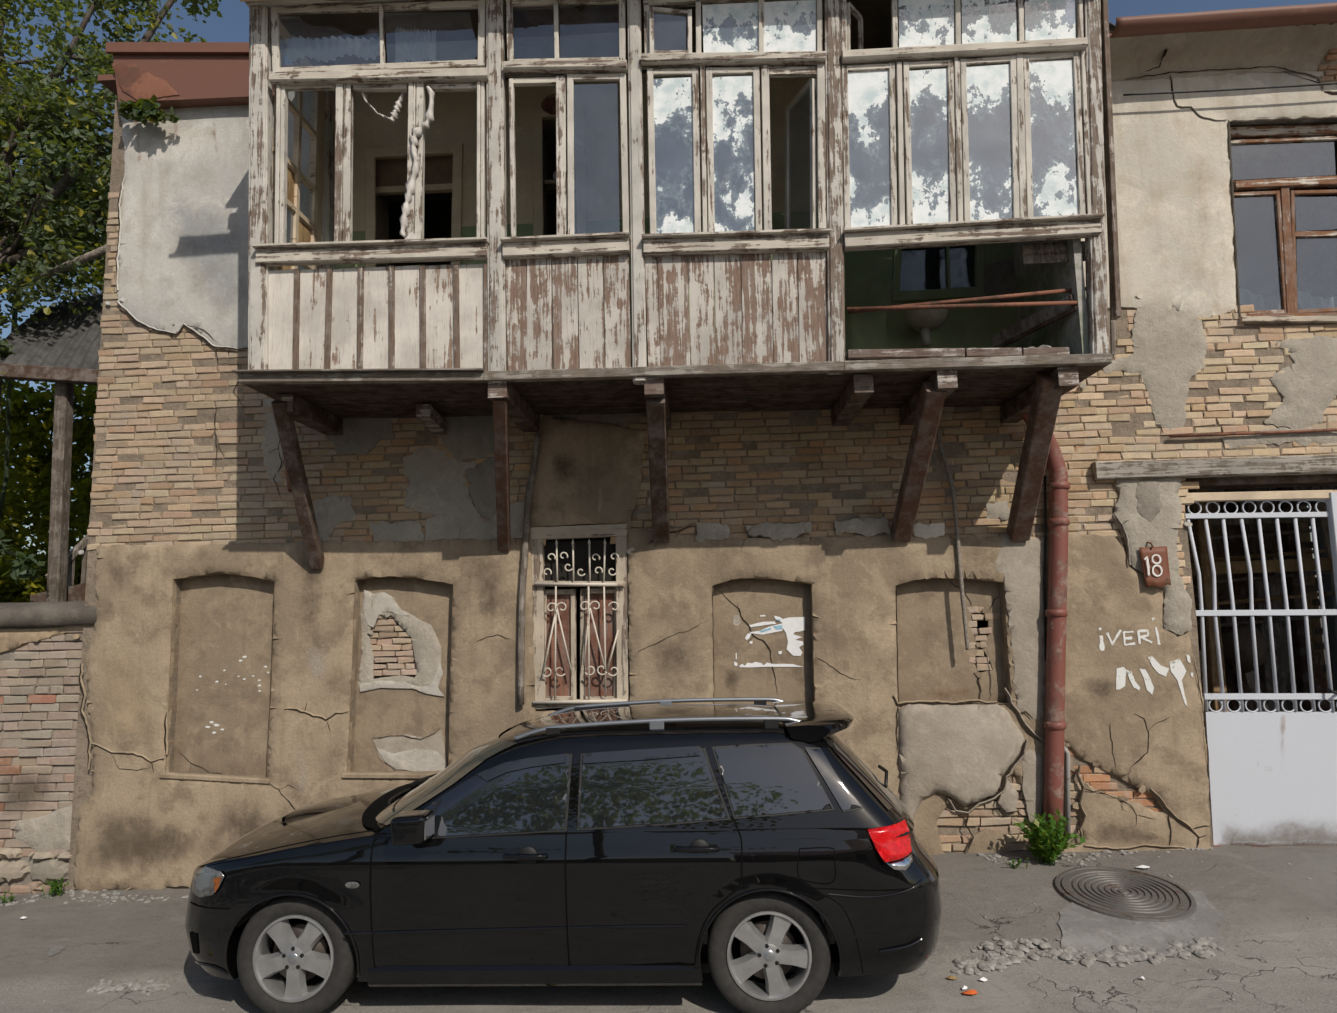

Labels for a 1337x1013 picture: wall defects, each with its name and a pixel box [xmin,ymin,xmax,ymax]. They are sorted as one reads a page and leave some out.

crack [1126,49,1337,121]
spalling [78,192,304,555]
spalling [666,408,914,539]
spalling [912,406,1027,538]
spalling [1053,293,1337,537]
spalling [0,625,83,856]
crack [77,663,222,774]
flaking render [357,590,444,696]
crack [719,590,778,695]
crack [893,580,1045,853]
crack [1076,713,1208,851]
crack [1193,657,1209,760]